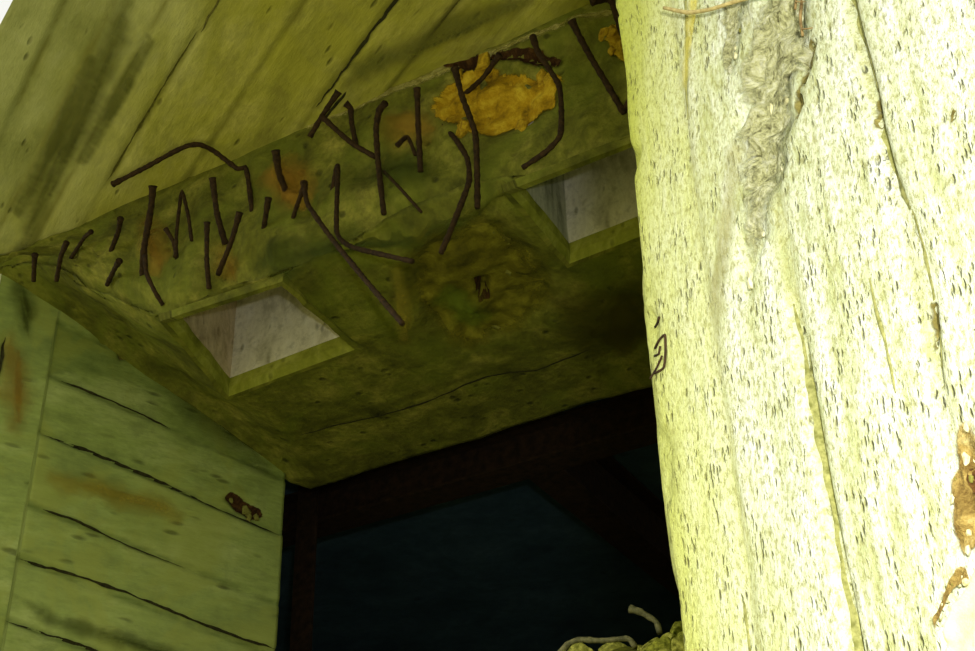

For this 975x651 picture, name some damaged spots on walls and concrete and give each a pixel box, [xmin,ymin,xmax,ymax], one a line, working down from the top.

water stain [18,17,147,244]
spalling [111,142,272,306]
rust [267,165,304,202]
spalling [271,34,565,345]
spalling [567,0,628,115]
spalling [721,0,816,258]
crack [851,0,879,89]
crack [881,114,936,301]
crack [869,278,896,393]
crack [937,329,945,369]
crack [793,304,864,651]
spalling [933,420,975,627]